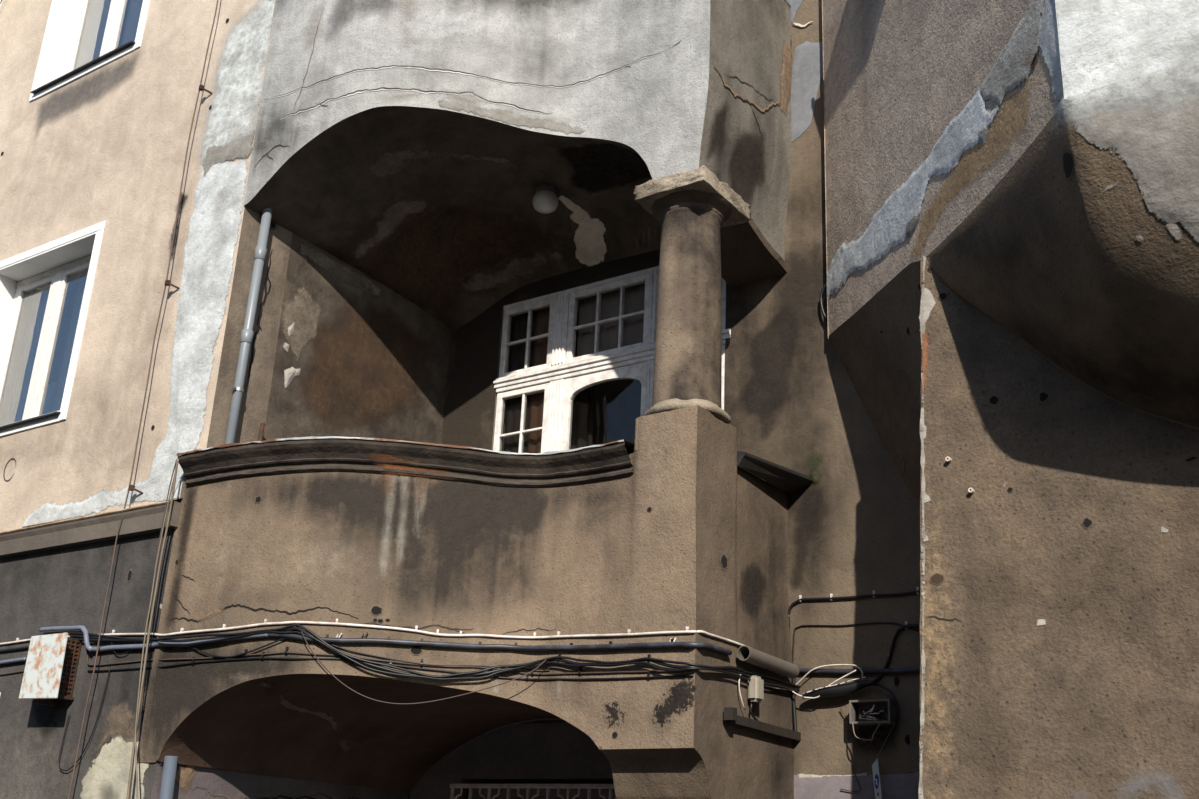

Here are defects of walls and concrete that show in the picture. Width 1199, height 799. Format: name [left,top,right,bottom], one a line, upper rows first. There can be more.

crack [791,21,813,59]
crack [253,6,681,169]
crack [714,67,781,135]
spalling [171,194,186,256]
peeling [1166,223,1182,240]
spalling [907,256,936,348]
flaking render [283,288,422,422]
crack [168,575,474,634]
spalling [918,373,931,799]
damp [652,677,697,727]
spalling [80,688,149,799]
crack [193,786,359,799]